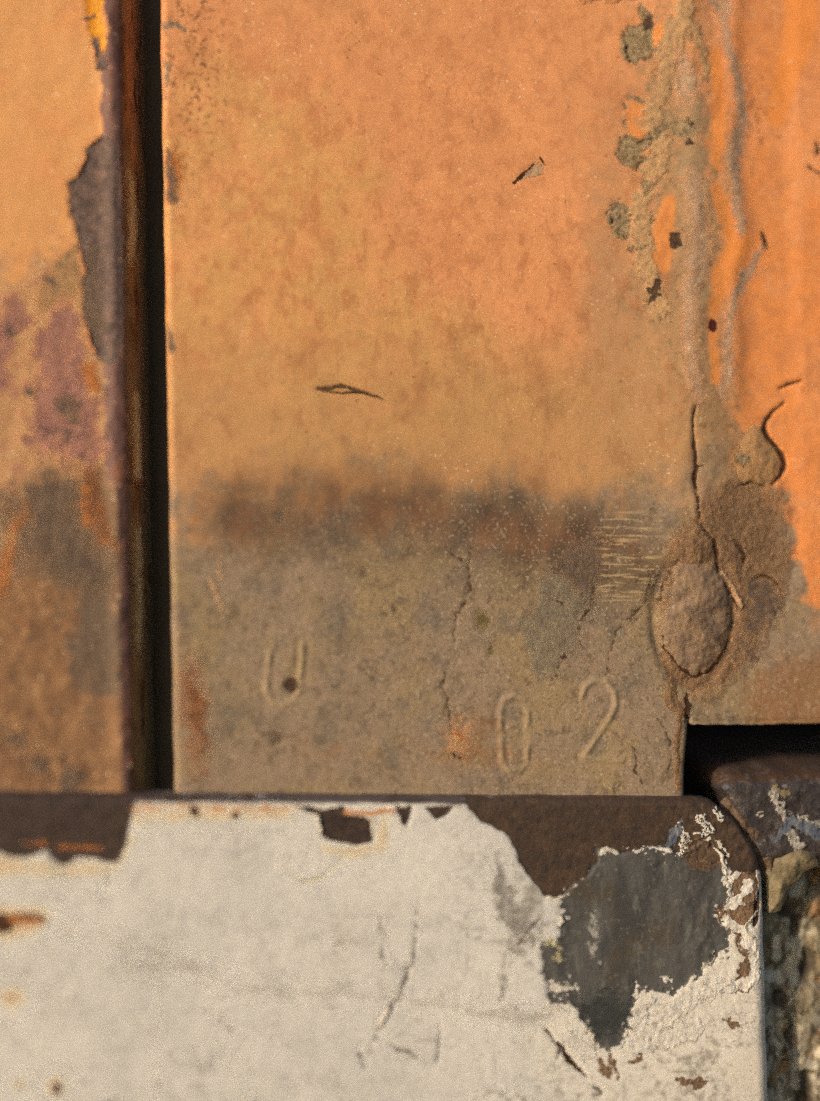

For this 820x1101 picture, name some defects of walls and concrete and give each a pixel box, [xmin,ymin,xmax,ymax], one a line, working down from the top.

peeling [606,0,710,322]
peeling [35,134,139,392]
rust [0,293,123,552]
crack [691,405,779,586]
crack [742,379,802,487]
crack [450,548,472,636]
peeling [0,792,137,871]
peeling [298,803,412,851]
rust [0,910,45,934]
crack [358,912,440,1067]
crack [545,1028,602,1097]
peeling [464,795,761,1081]